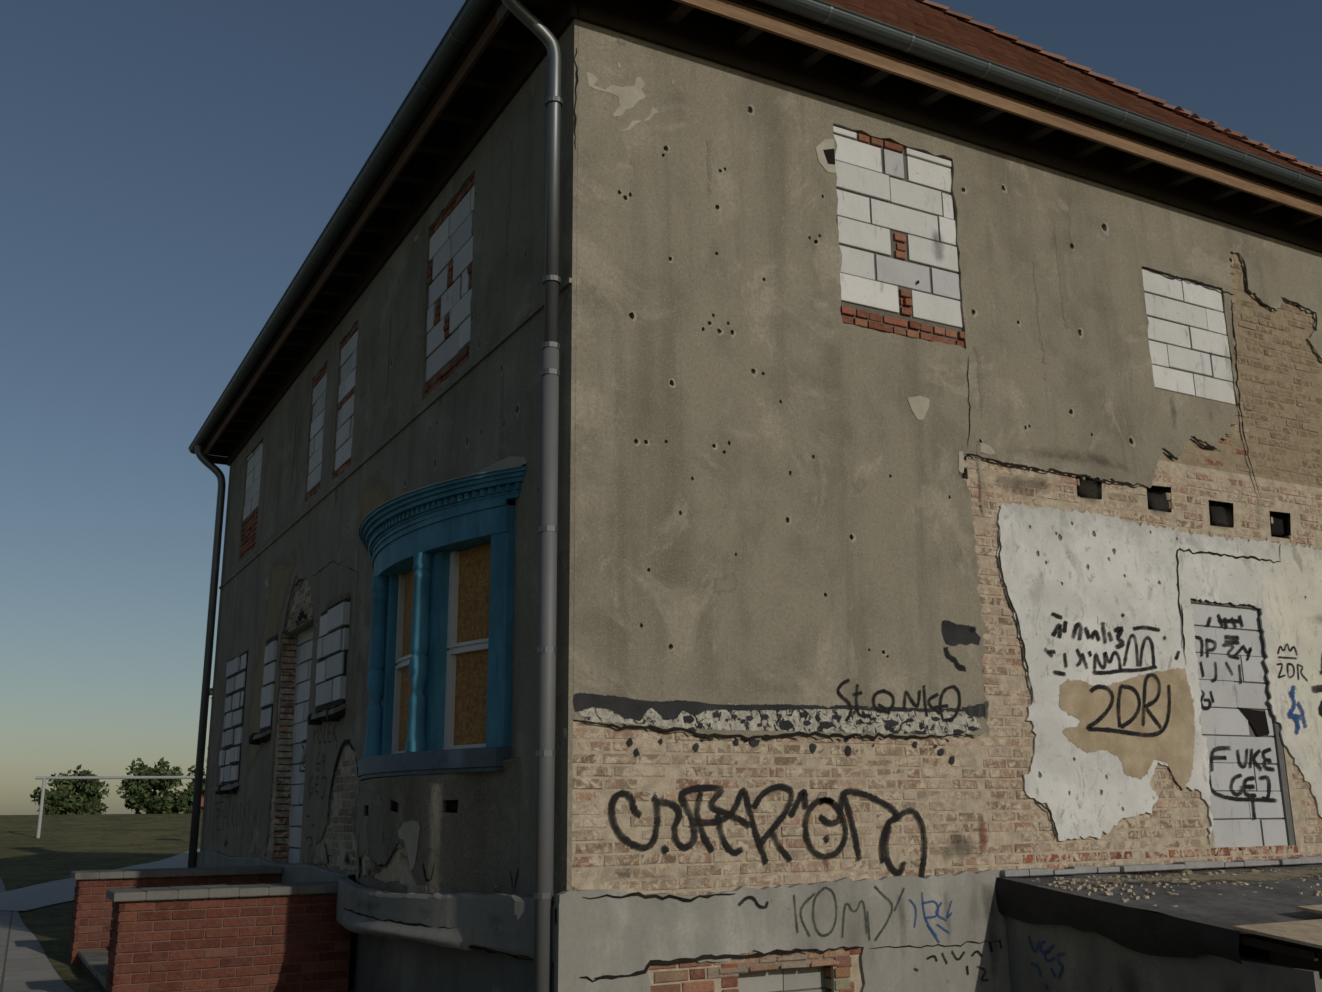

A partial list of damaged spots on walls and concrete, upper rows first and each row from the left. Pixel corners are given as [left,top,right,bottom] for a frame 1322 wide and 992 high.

flaking render [287,579,318,633]
peeling [561,253,1322,895]
flaking render [305,743,427,893]